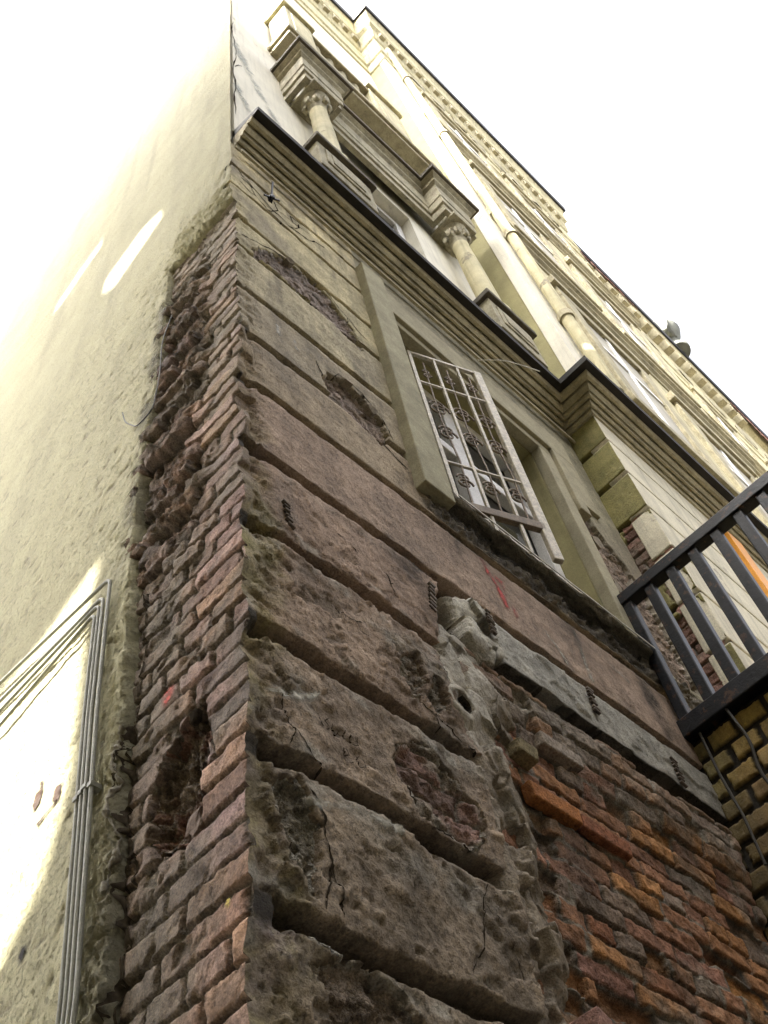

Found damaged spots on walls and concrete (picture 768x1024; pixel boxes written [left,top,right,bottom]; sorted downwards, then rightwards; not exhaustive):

spalling [252,247,361,351]
spalling [323,379,385,446]
flaking render [585,514,673,593]
spalling [119,198,256,1024]
flaking render [666,585,727,692]
crack [281,693,345,917]
spalling [392,624,768,1024]
crack [473,873,524,980]